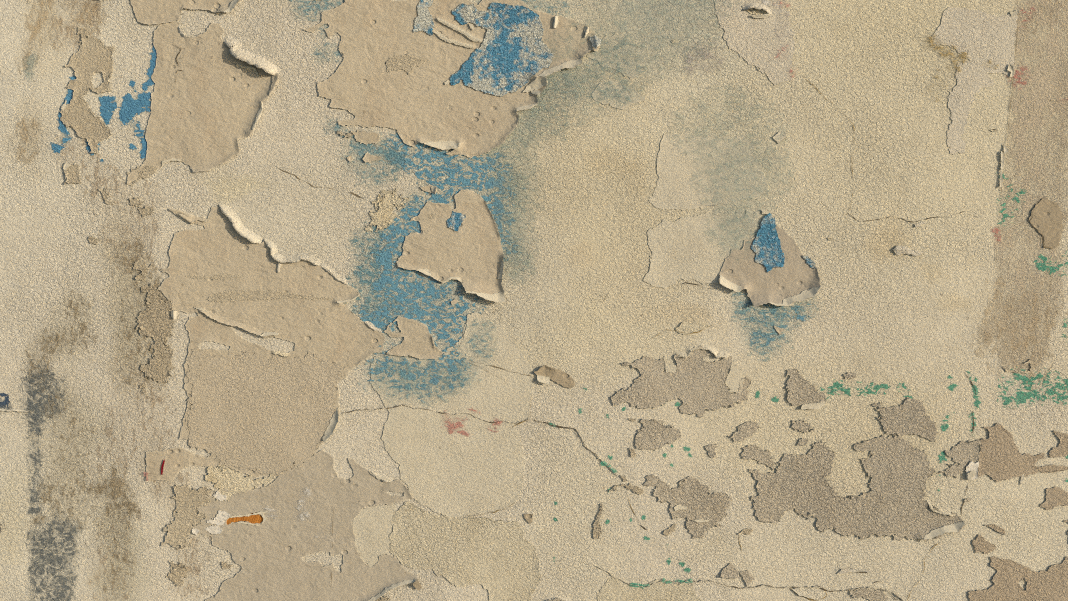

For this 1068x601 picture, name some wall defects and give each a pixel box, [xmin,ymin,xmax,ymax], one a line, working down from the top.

peeling [60,35,115,153]
peeling [126,21,281,217]
peeling [304,0,601,163]
peeling [365,185,505,304]
peeling [719,210,821,307]
peeling [136,200,443,601]
crack [342,404,646,530]
peeling [609,474,733,539]
peeling [611,343,751,458]
peeling [848,588,888,601]
peeling [729,369,1068,542]
peeling [968,524,1068,601]